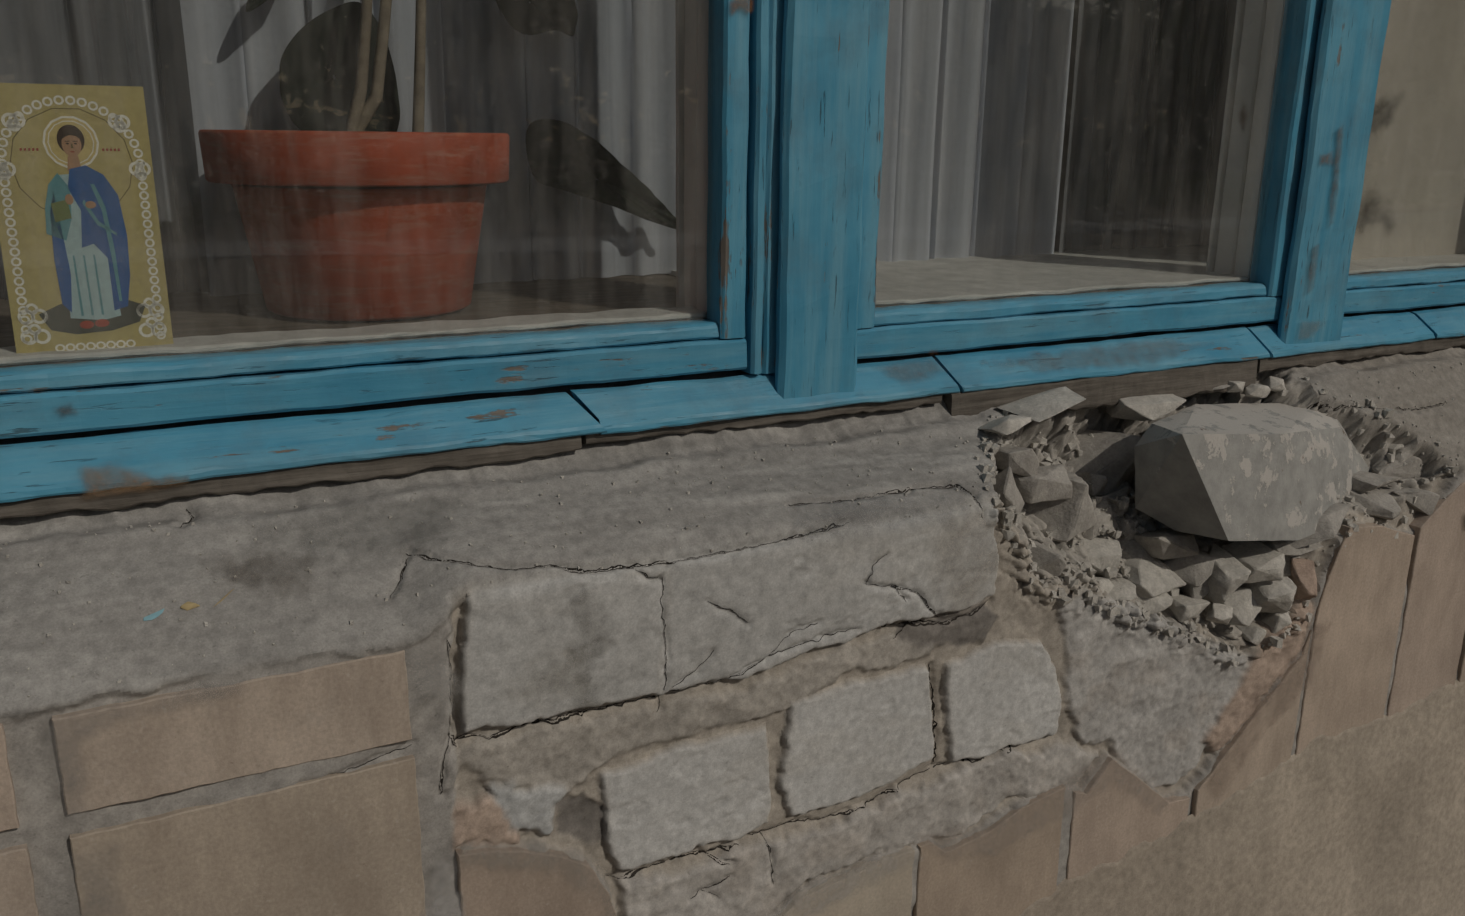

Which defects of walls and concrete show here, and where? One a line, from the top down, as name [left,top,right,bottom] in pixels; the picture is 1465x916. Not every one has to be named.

crack [337,484,986,793]
crack [606,665,1046,899]
spalling [450,367,1459,916]